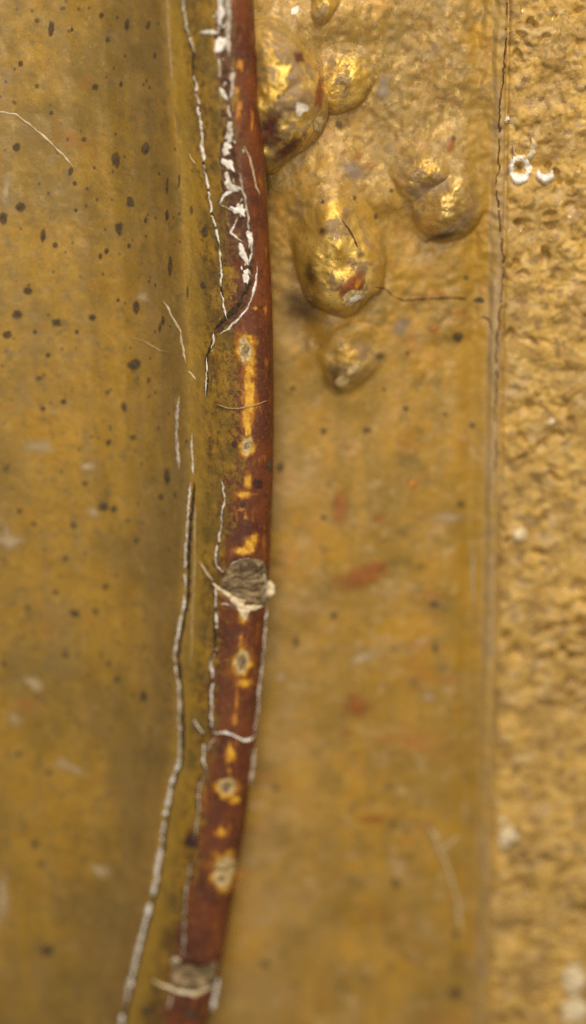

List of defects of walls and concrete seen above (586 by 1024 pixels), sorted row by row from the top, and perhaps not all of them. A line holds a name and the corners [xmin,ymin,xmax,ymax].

crack [166,0,258,397]
crack [377,3,508,471]
crack [119,397,268,1024]